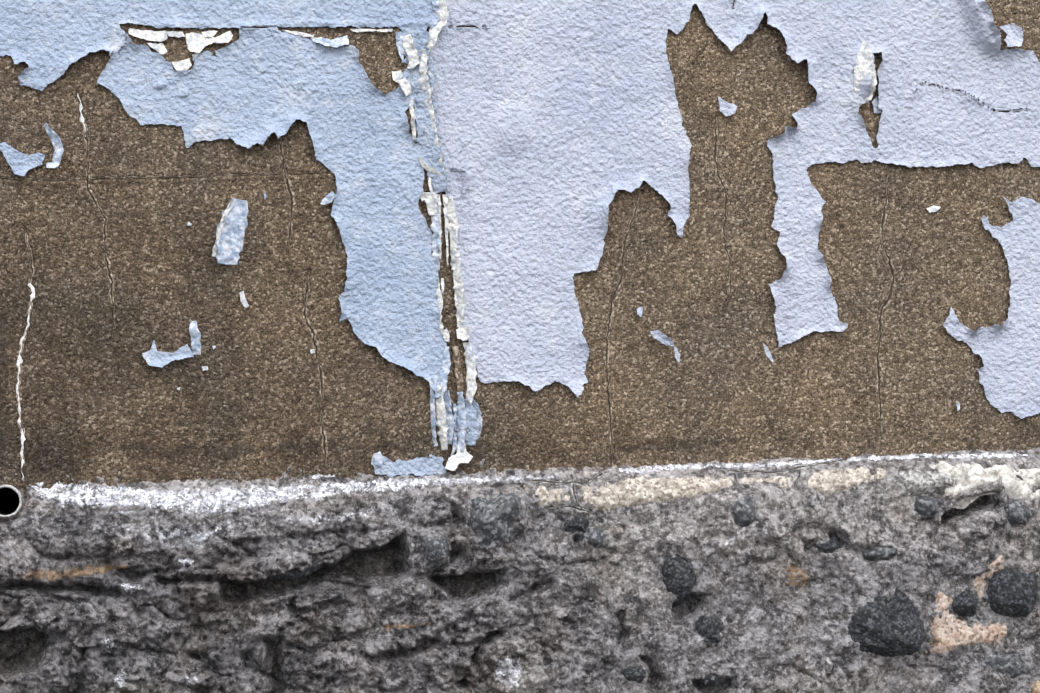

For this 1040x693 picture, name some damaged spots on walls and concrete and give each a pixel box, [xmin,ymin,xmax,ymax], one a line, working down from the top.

crack [15,225,35,481]
crack [2,91,323,328]
crack [302,270,328,468]
peeling [371,451,446,477]
peeling [0,0,1040,419]
crack [525,191,641,522]
crack [875,169,919,439]